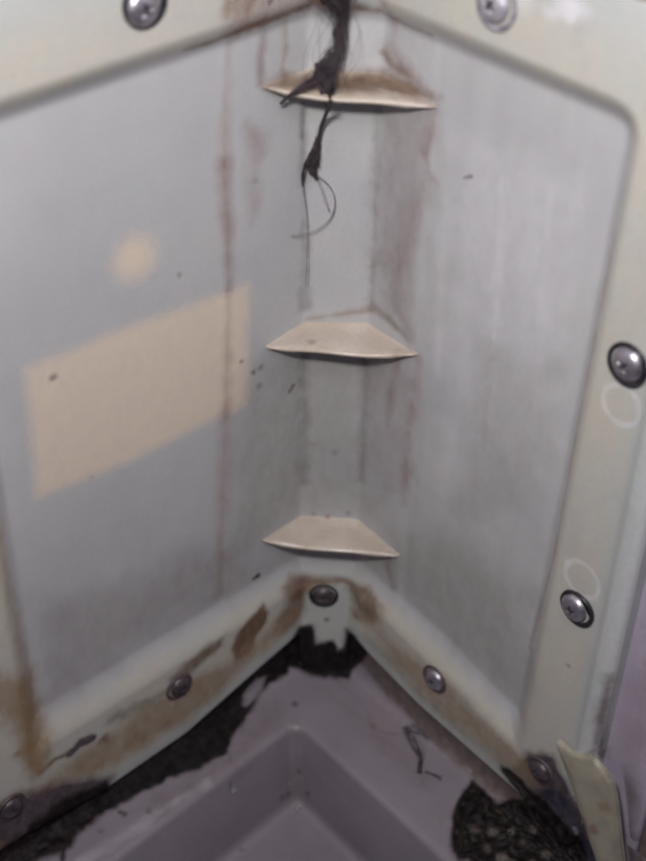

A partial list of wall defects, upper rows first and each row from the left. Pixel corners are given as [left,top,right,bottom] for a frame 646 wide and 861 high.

corrosion [170,575,379,684]
corrosion [42,734,108,772]
water stain [0,609,367,861]